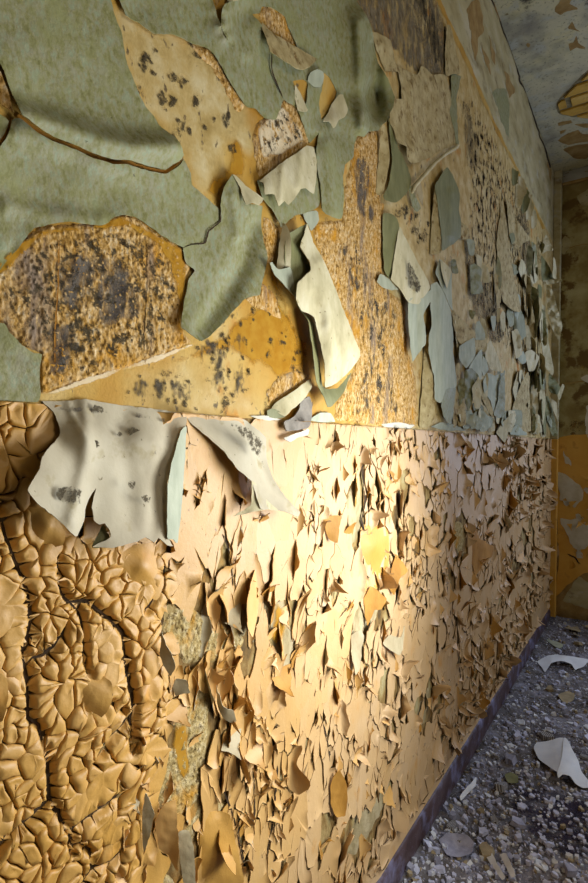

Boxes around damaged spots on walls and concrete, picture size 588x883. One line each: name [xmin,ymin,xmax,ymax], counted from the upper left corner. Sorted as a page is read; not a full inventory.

crack [0,520,133,883]
leakage [0,218,186,374]
peeling [27,371,419,883]
peeling [0,0,461,407]
leakage [356,0,532,344]
peeling [313,131,588,818]
peeling [467,0,495,75]
peeling [492,71,515,137]